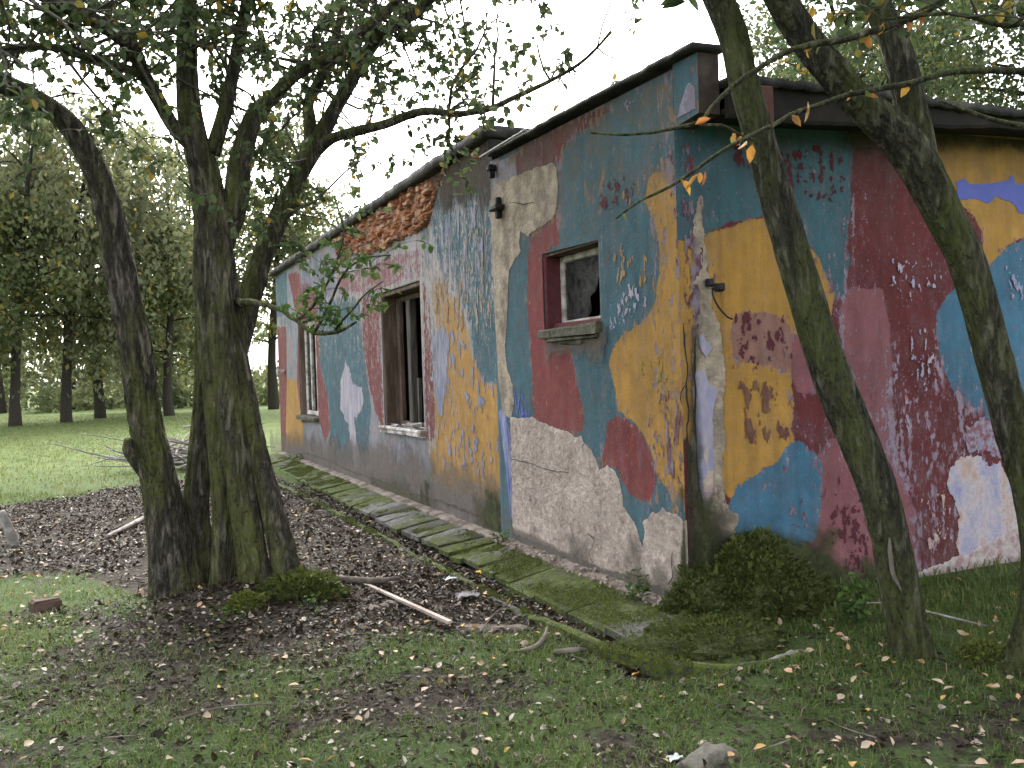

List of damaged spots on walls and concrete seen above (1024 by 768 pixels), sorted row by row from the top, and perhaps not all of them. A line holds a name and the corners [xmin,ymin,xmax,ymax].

peeling [781,144,852,243]
peeling [890,258,942,301]
spalling [300,142,793,591]
peeling [903,328,938,432]
crack [507,427,568,525]
peeling [918,417,1021,577]